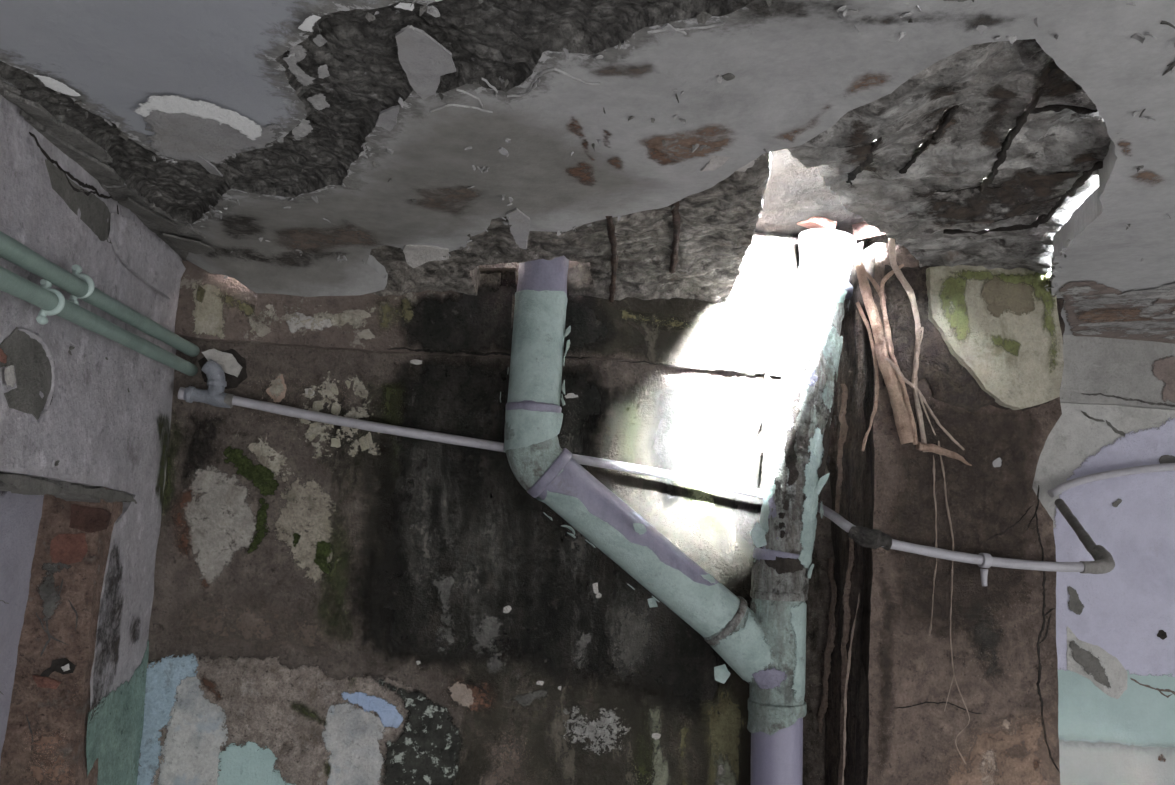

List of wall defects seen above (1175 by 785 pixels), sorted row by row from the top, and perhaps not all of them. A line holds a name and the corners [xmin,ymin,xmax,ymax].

spalling [0,0,772,339]
spalling [343,143,771,453]
corrosion [566,119,596,186]
corrosion [604,130,622,169]
corrosion [643,126,732,165]
spalling [787,18,1175,413]
water stain [952,270,1057,373]
water stain [172,415,257,587]
water stain [247,270,751,785]
water stain [557,233,799,608]
peeling [194,655,414,785]
crack [1130,678,1175,698]